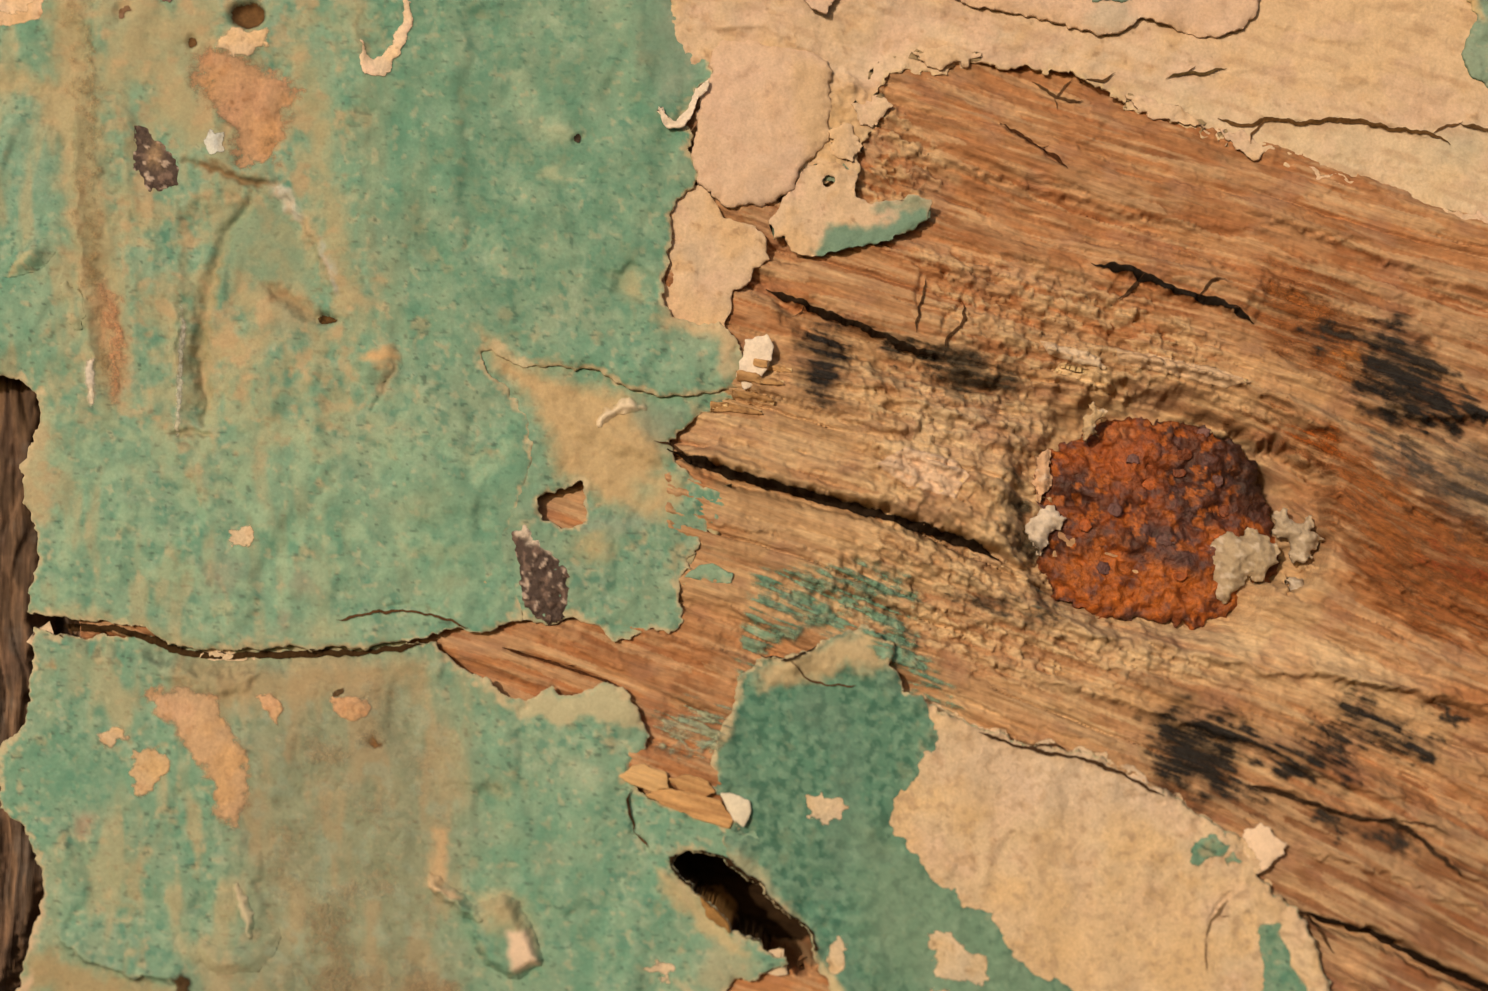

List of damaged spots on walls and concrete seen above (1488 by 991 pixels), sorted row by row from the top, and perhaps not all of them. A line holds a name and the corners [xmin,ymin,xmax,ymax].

peeling [0,0,44,26]
peeling [657,80,710,129]
peeling [828,95,893,162]
peeling [1125,93,1275,161]
peeling [736,334,774,390]
corrosion [1126,454,1186,490]
corrosion [1096,561,1111,575]
crack [53,609,465,660]
crack [502,647,617,685]
peeling [720,793,751,827]
spalling [805,793,849,825]
peeling [889,695,1330,991]